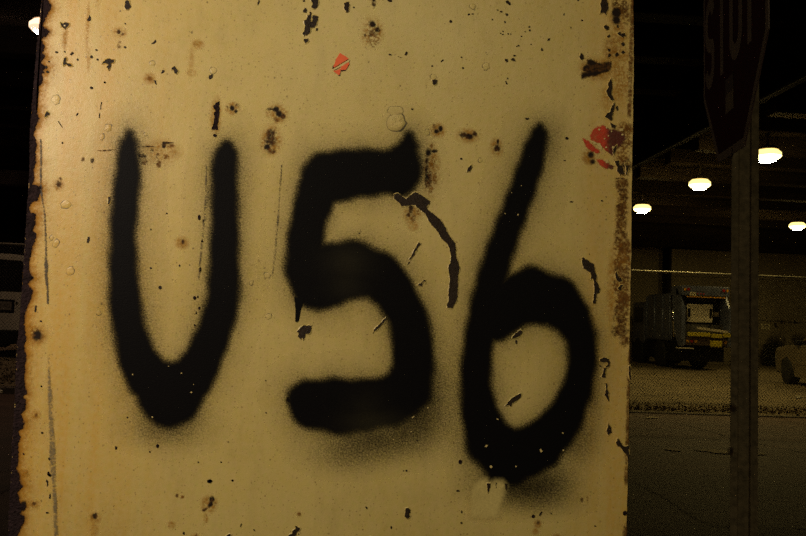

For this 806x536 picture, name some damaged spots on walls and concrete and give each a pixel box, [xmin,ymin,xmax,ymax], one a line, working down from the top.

peeling [301,0,320,44]
corrosion [364,21,381,45]
corrosion [581,0,634,116]
peeling [582,78,629,179]
corrosion [8,0,54,536]
peeling [581,257,601,304]
corrosion [611,178,631,361]